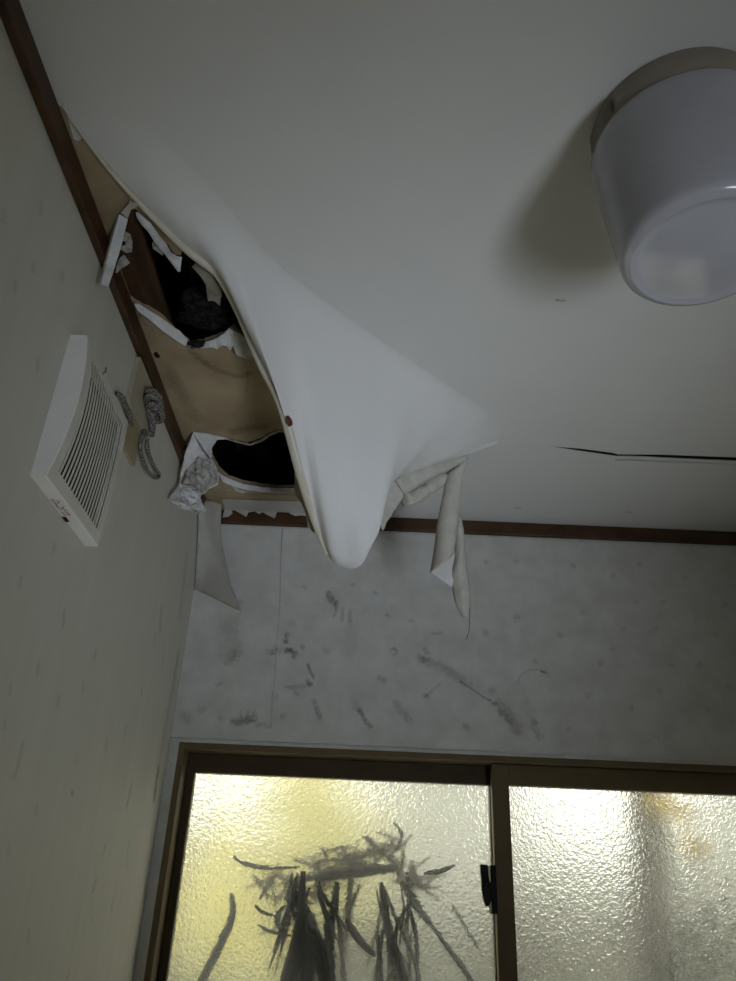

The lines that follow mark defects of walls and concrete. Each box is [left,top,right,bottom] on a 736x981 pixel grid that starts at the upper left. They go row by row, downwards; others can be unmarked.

peeling [59,106,182,272]
peeling [115,231,284,447]
peeling [194,451,300,614]
crack [560,447,736,465]